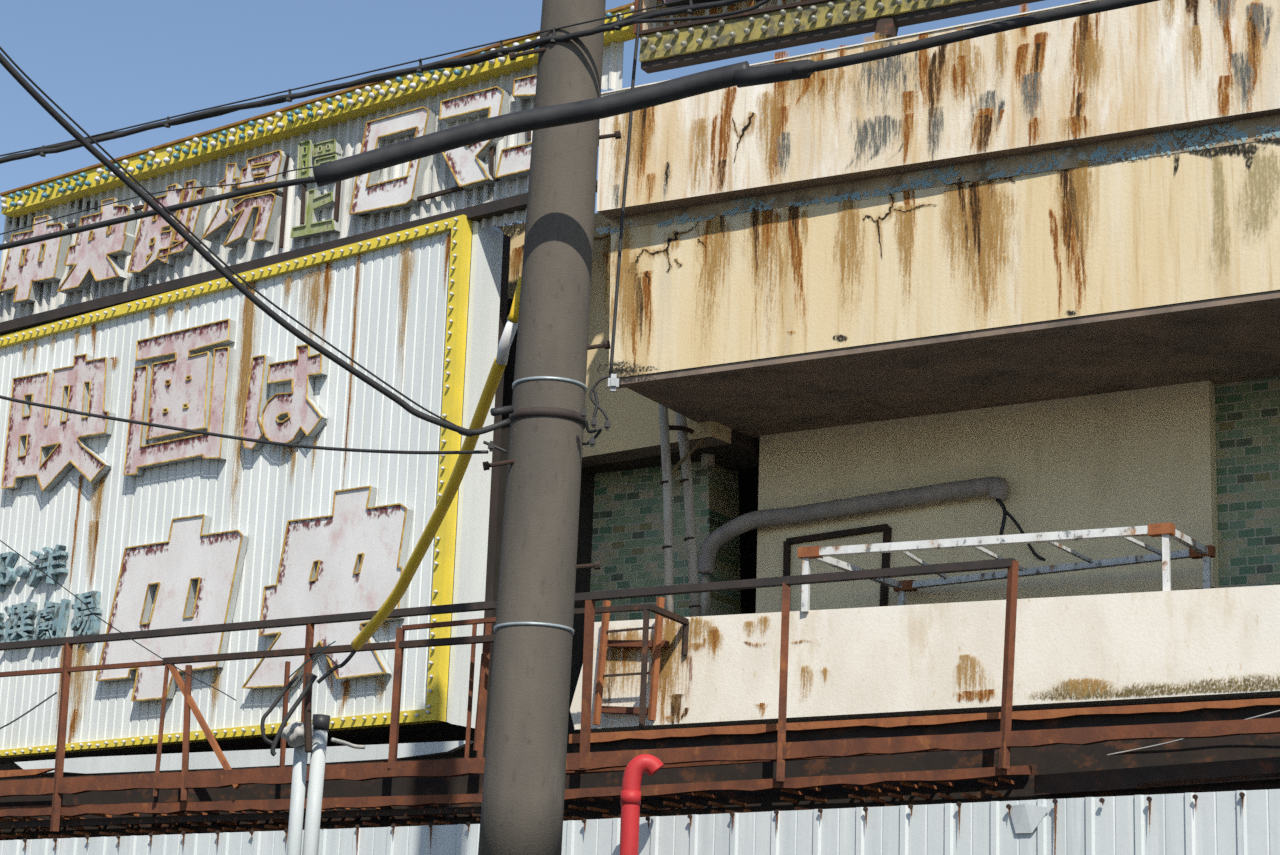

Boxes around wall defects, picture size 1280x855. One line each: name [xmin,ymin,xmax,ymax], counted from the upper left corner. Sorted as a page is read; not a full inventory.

rust [692,86,736,188]
crack [732,111,756,162]
rust [757,45,847,178]
rust [901,3,1048,164]
rust [1065,0,1102,139]
rust [1165,0,1271,116]
crack [626,222,706,285]
rust [744,206,808,329]
crack [862,176,1016,257]
rust [1049,160,1093,312]
rust [603,617,720,723]
water stain [1033,675,1280,700]